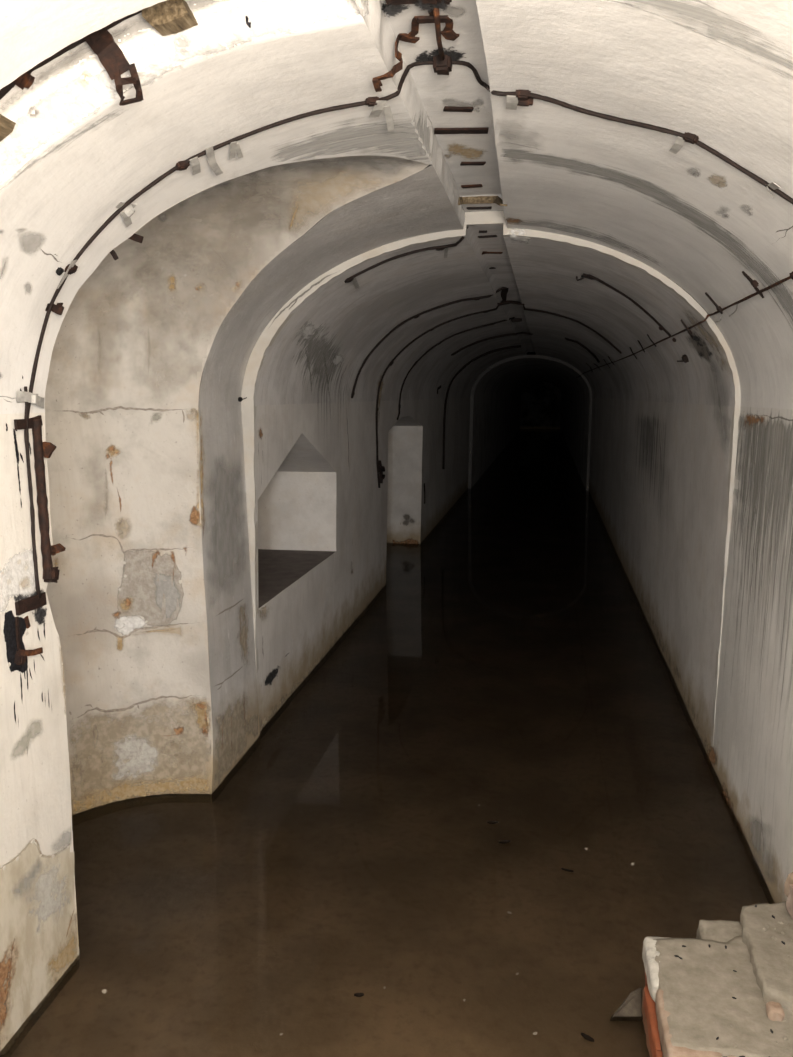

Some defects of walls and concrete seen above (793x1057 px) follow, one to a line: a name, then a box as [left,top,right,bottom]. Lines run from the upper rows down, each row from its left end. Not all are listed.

damp [278,115,431,227]
damp [503,134,793,321]
damp [296,324,343,418]
damp [689,334,712,361]
spalling [0,551,47,699]
spalling [117,550,184,626]
damp [734,413,793,656]
peeling [0,839,79,1056]